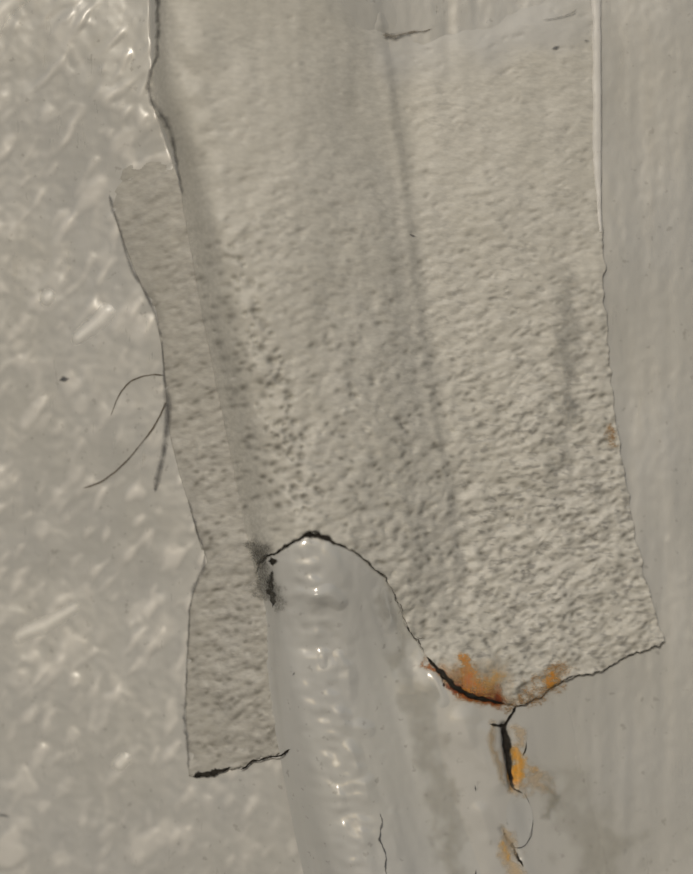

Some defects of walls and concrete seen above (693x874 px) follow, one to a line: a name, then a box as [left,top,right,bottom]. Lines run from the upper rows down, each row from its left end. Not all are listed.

crack [257,530,653,793]
corrosion [421,654,567,712]
corrosion [490,728,544,790]
crack [503,830,523,866]